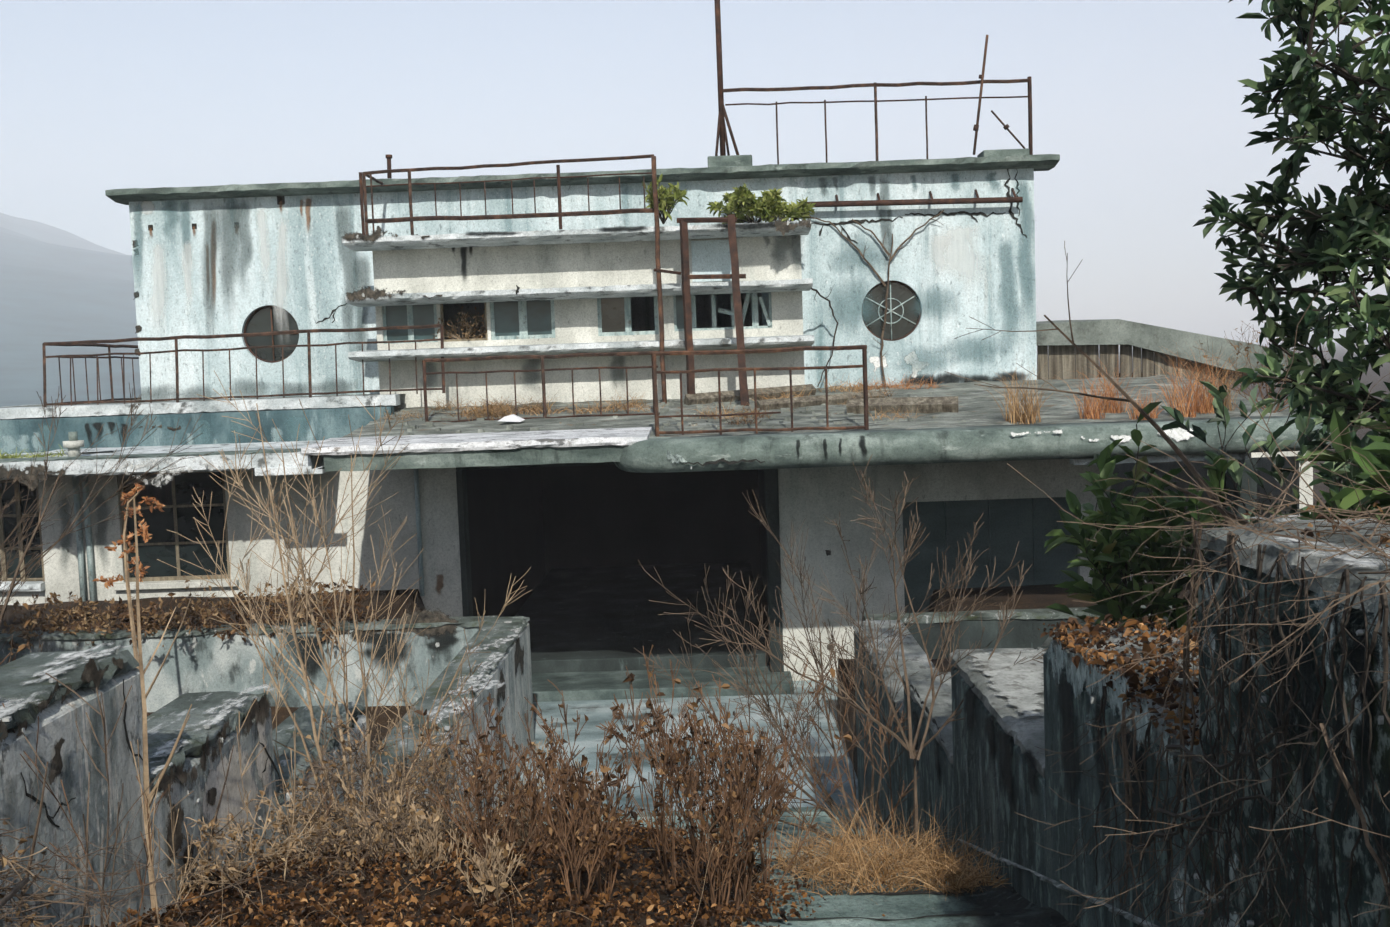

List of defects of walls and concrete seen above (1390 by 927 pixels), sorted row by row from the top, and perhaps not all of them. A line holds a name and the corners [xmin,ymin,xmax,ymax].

leakage [905,372,1025,384]
leakage [1057,677,1144,838]
leakage [1269,614,1314,809]
leakage [1348,627,1373,761]